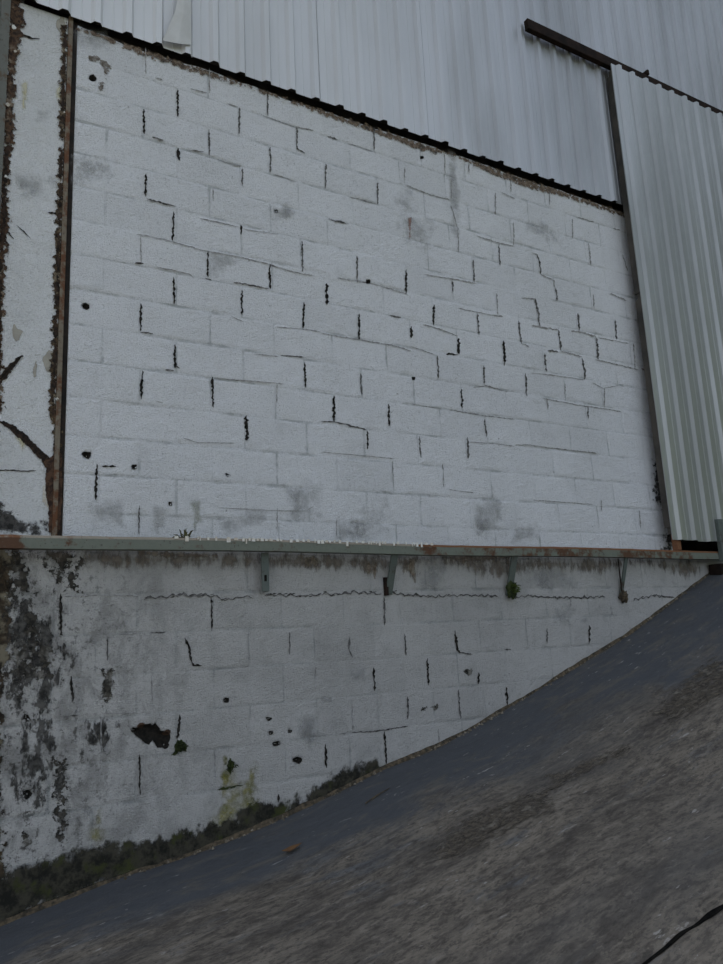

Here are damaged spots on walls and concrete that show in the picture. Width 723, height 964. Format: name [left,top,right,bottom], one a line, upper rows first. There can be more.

crack [143,109,244,186]
crack [136,154,639,458]
crack [0,355,24,383]
crack [0,406,63,472]
crack [321,396,394,484]
water stain [42,550,418,594]
water stain [434,556,700,578]
crack [59,590,612,685]
water stain [0,550,74,846]
water stain [73,668,120,762]
water stain [0,829,8,879]
crack [642,904,723,964]